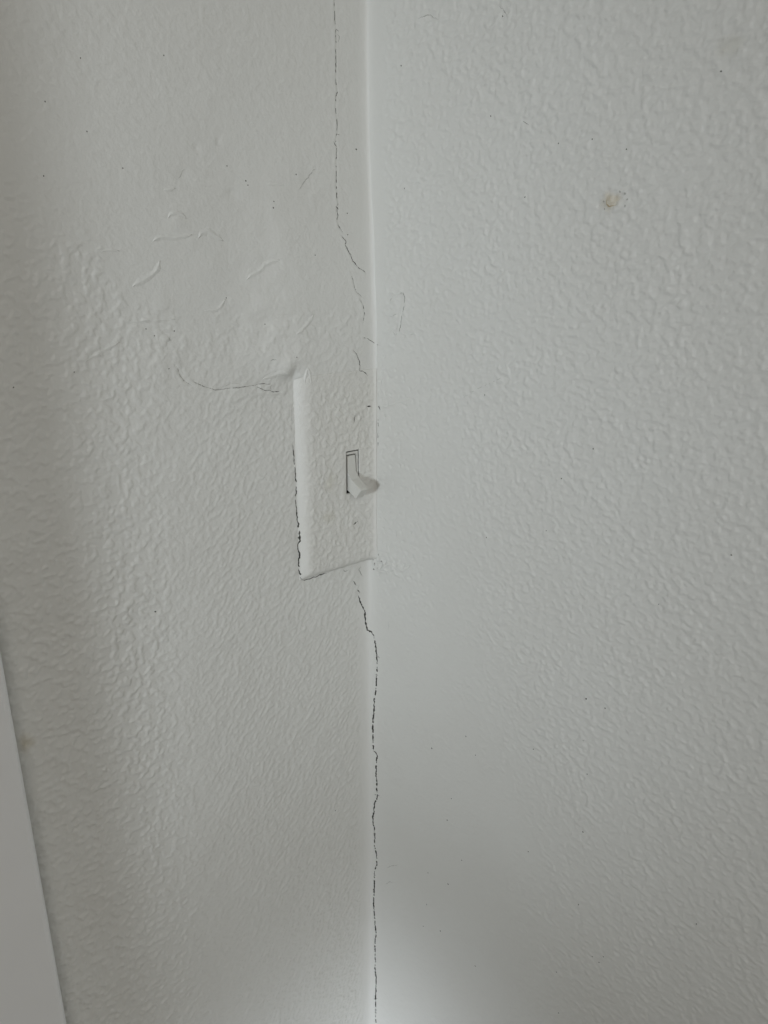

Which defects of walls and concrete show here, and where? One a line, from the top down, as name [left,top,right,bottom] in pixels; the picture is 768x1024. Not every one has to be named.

crack [177,368,379,1022]